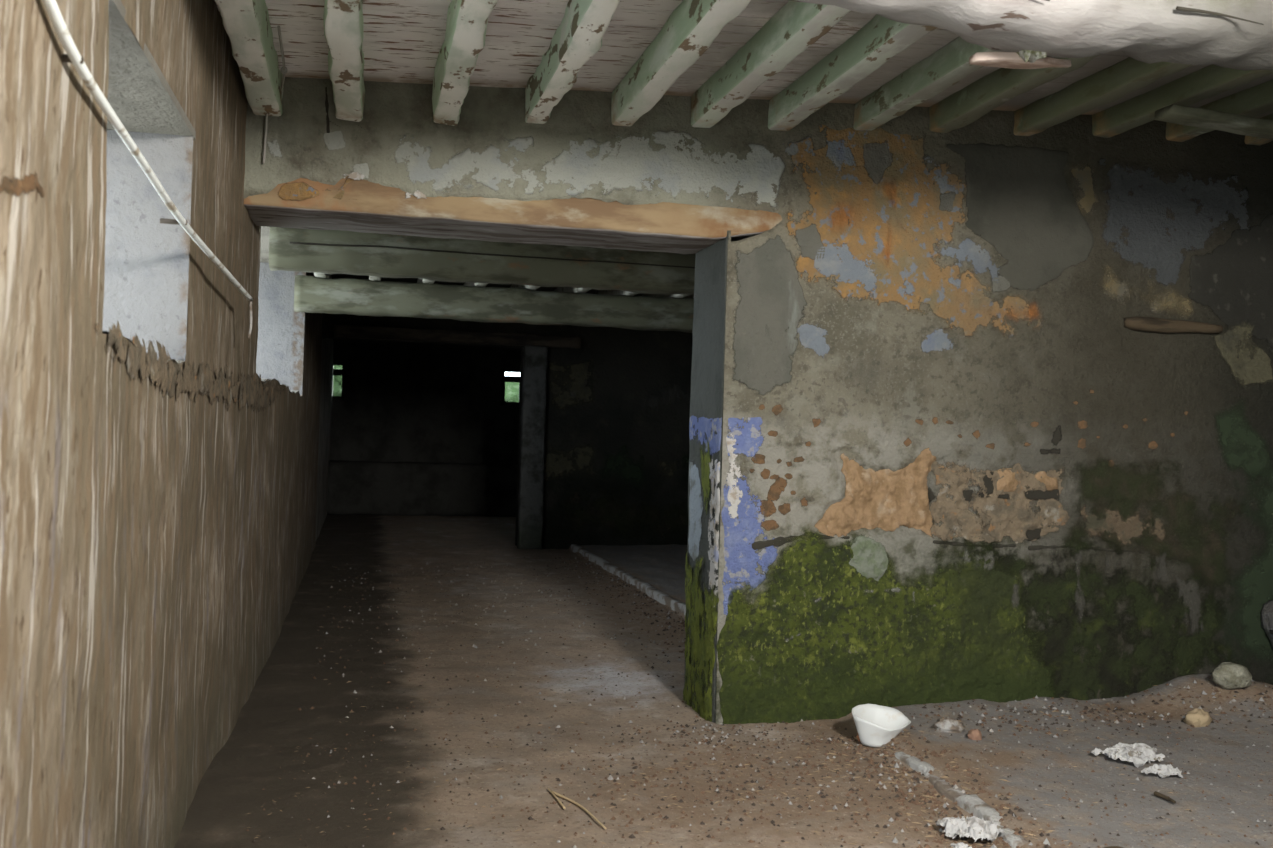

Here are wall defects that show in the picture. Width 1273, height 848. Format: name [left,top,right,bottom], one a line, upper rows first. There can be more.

peeling [323,130,346,150]
flaking render [0,170,45,198]
flaking render [278,163,369,201]
peeling [395,125,1042,356]
peeling [1070,158,1250,317]
peeling [688,404,811,615]
flaking render [814,438,1166,581]
leakage [964,550,994,570]
leakage [1156,554,1203,632]